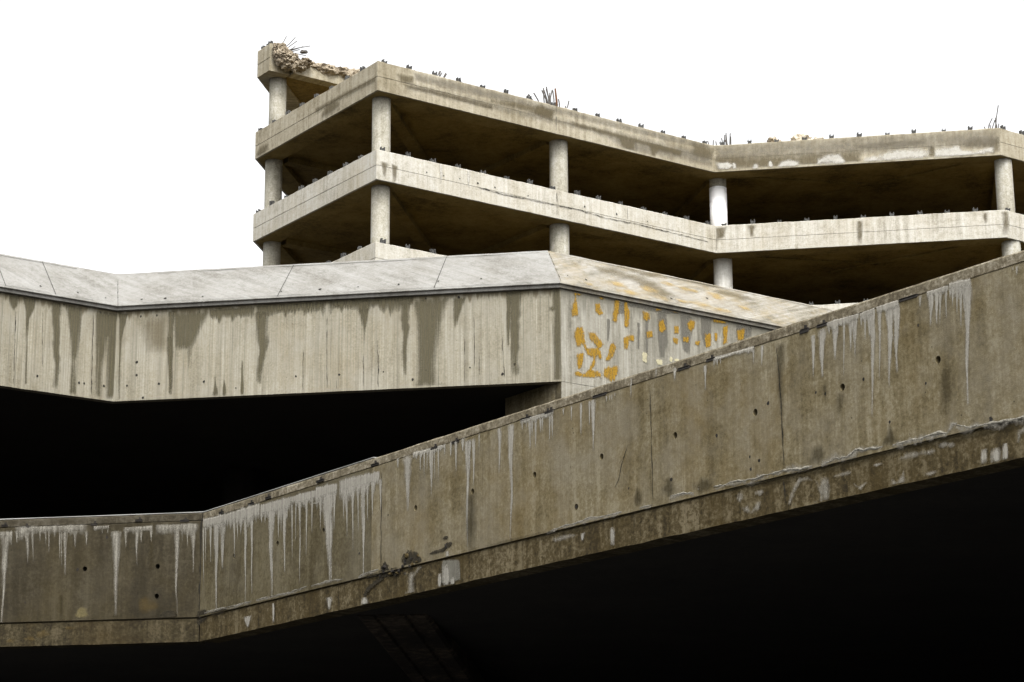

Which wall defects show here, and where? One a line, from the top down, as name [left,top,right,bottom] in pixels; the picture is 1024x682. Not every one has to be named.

spalling [257,36,360,111]
leakage [9,295,36,329]
leakage [52,302,82,393]
leakage [96,311,128,397]
leakage [147,297,464,390]
leakage [506,291,521,373]
leakage [551,290,561,380]
efflorescence [811,300,900,404]
leakage [919,279,971,399]
leakage [397,436,480,540]
leakage [498,396,622,541]
leakage [0,471,382,621]